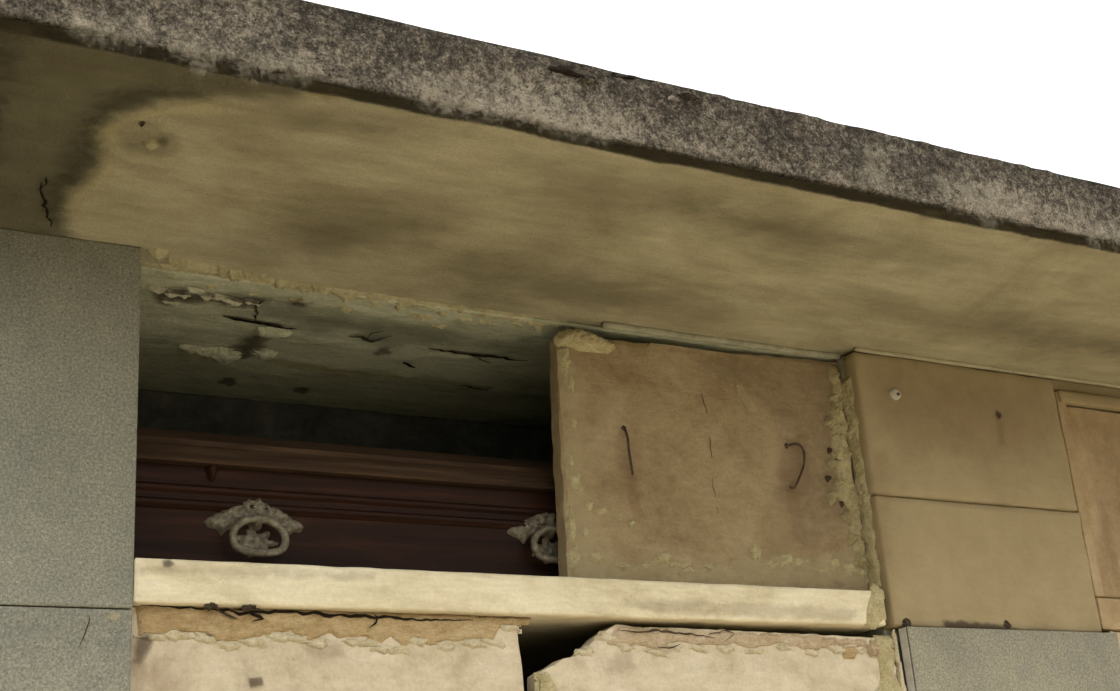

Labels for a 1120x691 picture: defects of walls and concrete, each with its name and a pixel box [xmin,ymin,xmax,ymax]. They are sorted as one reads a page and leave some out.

leakage [0,16,1120,254]
crack [39,178,53,227]
peeling [148,286,268,307]
peeling [178,326,294,364]
crack [349,331,391,343]
crack [403,348,527,391]
crack [148,605,474,628]
peeling [132,602,531,655]
peeling [574,627,907,691]